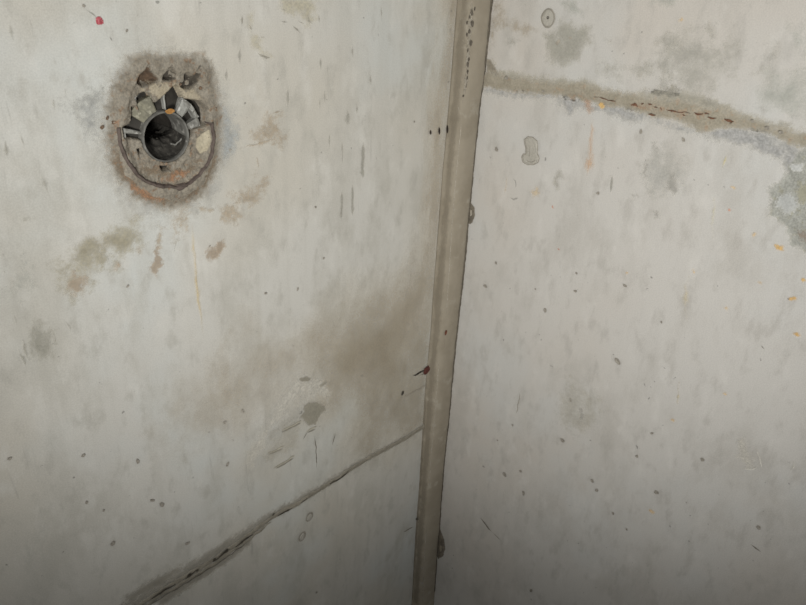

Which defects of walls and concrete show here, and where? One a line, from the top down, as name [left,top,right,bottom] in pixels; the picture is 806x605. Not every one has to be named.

spalling [100,51,232,211]
leakage [485,59,799,170]
leakage [318,270,432,445]
crack [150,534,254,605]
leakage [125,479,333,605]